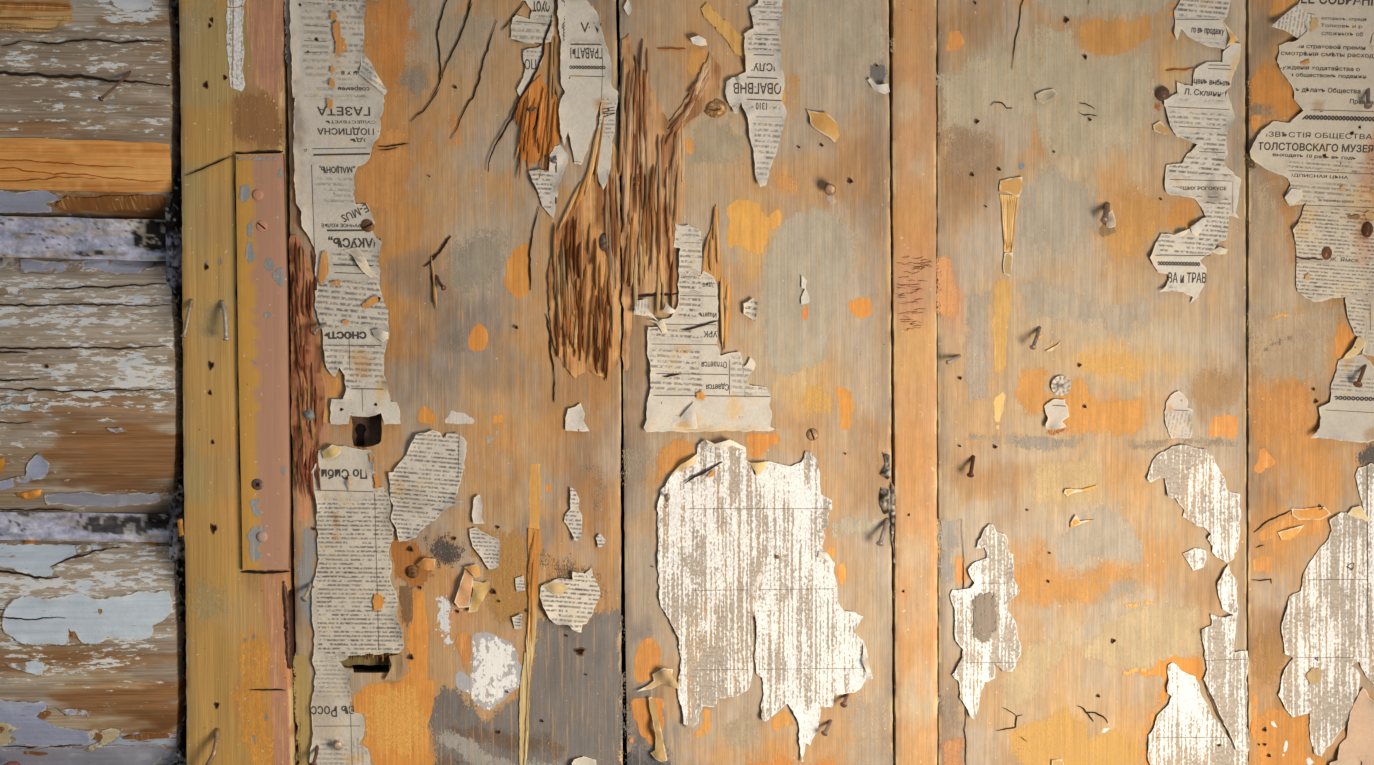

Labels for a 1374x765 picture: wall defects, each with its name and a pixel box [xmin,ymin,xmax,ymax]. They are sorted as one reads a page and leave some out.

crack [378,0,556,172]
peeling [1246,58,1297,131]
peeling [0,190,165,214]
peeling [354,128,415,214]
peeling [0,453,165,508]
peeling [652,437,697,487]
peeling [746,433,780,458]
peeling [0,543,126,577]
peeling [1253,507,1331,572]
peeling [2,590,173,677]
peeling [0,699,169,765]
peeling [1131,655,1205,765]